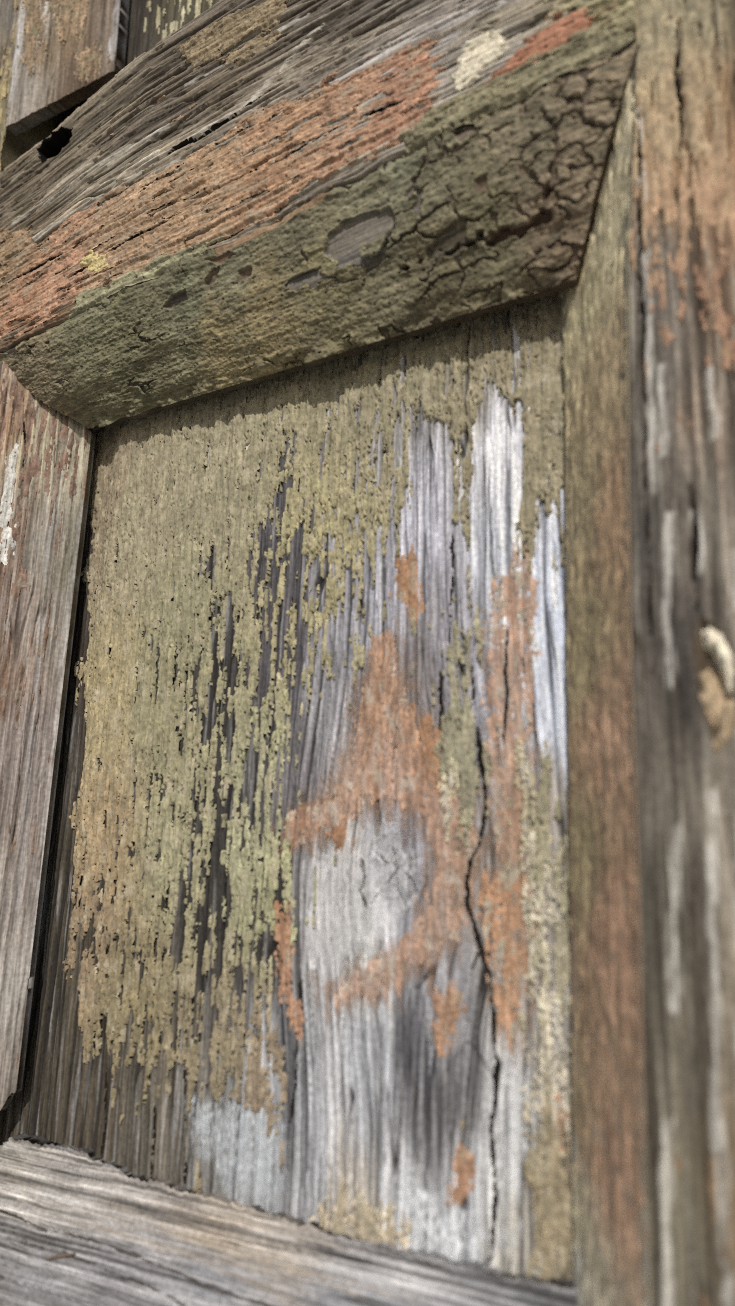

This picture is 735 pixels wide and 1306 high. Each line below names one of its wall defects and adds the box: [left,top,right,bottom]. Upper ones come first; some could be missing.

peeling [0,0,735,372]
peeling [349,631,365,685]
peeling [326,817,348,853]
peeling [202,903,217,975]
peeling [469,853,478,908]
crack [438,535,509,1264]
peeling [243,949,288,1138]
peeling [430,978,467,1059]
peeling [446,1118,477,1208]
peeling [308,1177,411,1251]